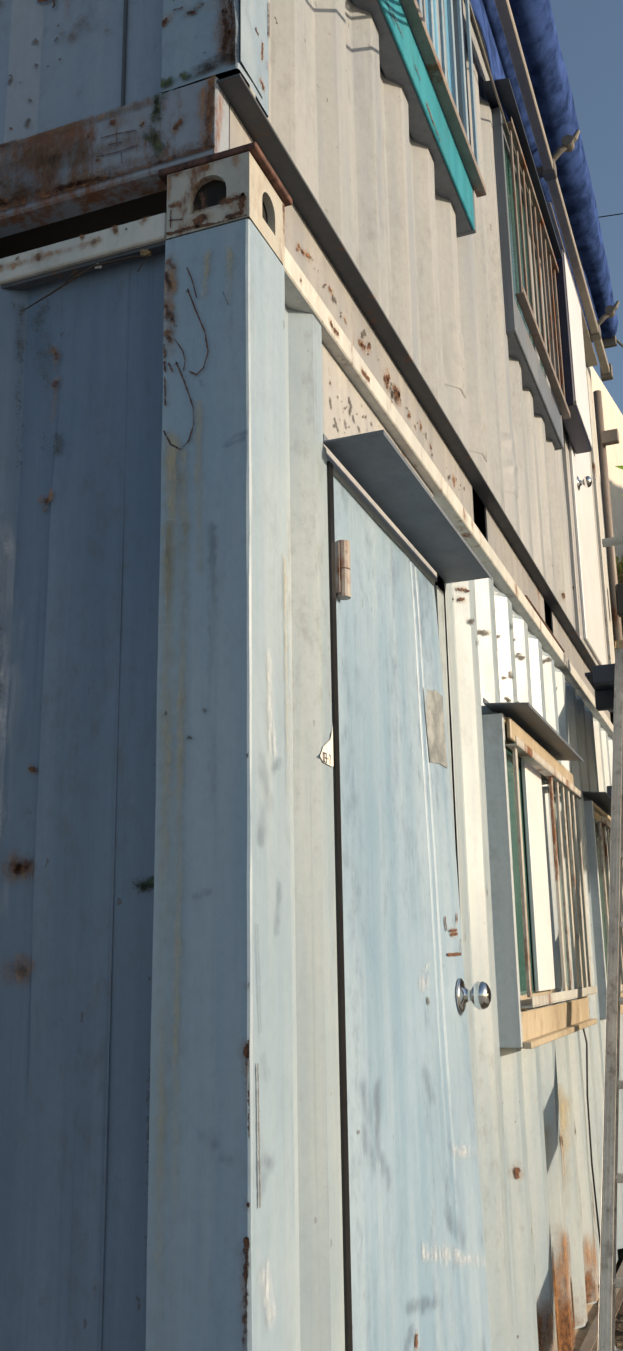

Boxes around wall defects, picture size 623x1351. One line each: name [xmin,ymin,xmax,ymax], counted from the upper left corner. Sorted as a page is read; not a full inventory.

corrosion [221,0,236,65]
corrosion [0,76,247,235]
corrosion [242,1237,250,1348]
corrosion [538,1236,597,1351]